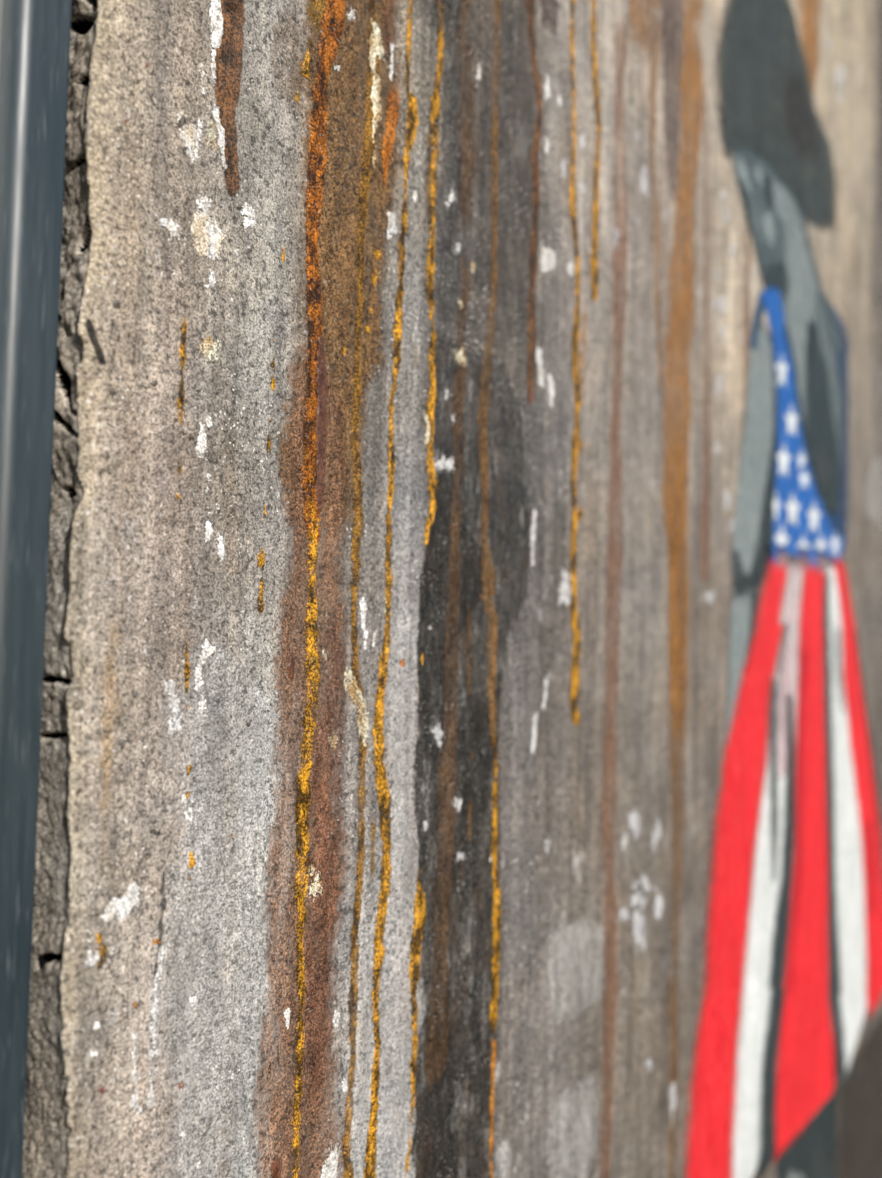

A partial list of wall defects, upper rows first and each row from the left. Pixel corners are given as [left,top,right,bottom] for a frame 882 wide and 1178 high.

corrosion [214,0,245,196]
corrosion [257,0,444,1178]
water stain [354,0,531,1178]
corrosion [569,0,602,726]